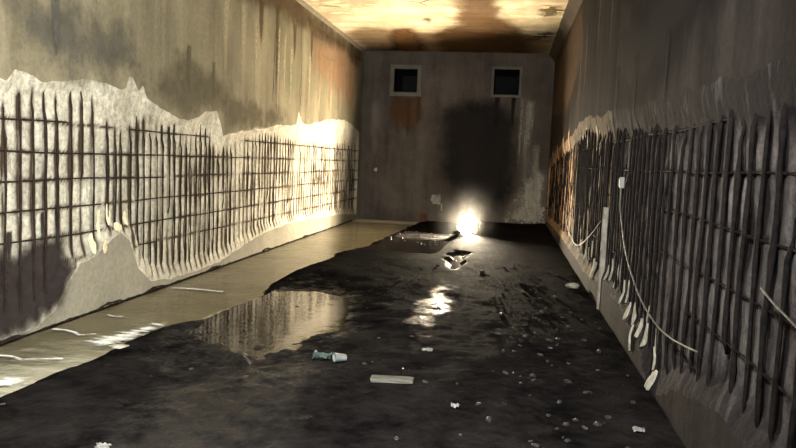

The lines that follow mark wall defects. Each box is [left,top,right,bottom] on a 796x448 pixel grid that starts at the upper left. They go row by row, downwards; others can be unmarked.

damp [27,0,132,66]
spalling [539,5,565,17]
spalling [546,60,796,448]